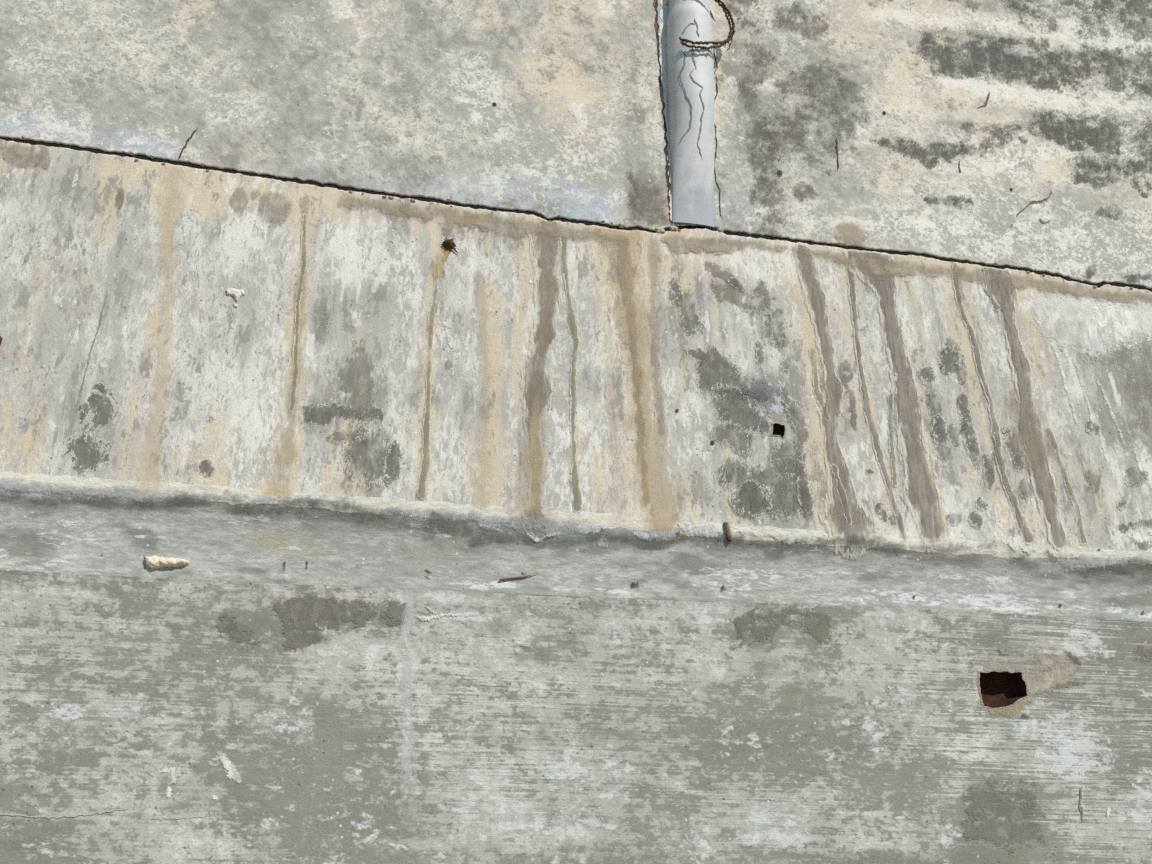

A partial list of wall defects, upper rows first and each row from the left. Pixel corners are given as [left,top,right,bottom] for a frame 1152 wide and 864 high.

water stain [116,187,125,207]
water stain [266,198,308,414]
rust [417,365,432,499]
rust [427,249,450,347]
water stain [339,197,722,546]
crack [0,0,1152,292]
water stain [627,0,1152,570]
spalling [978,643,1087,718]